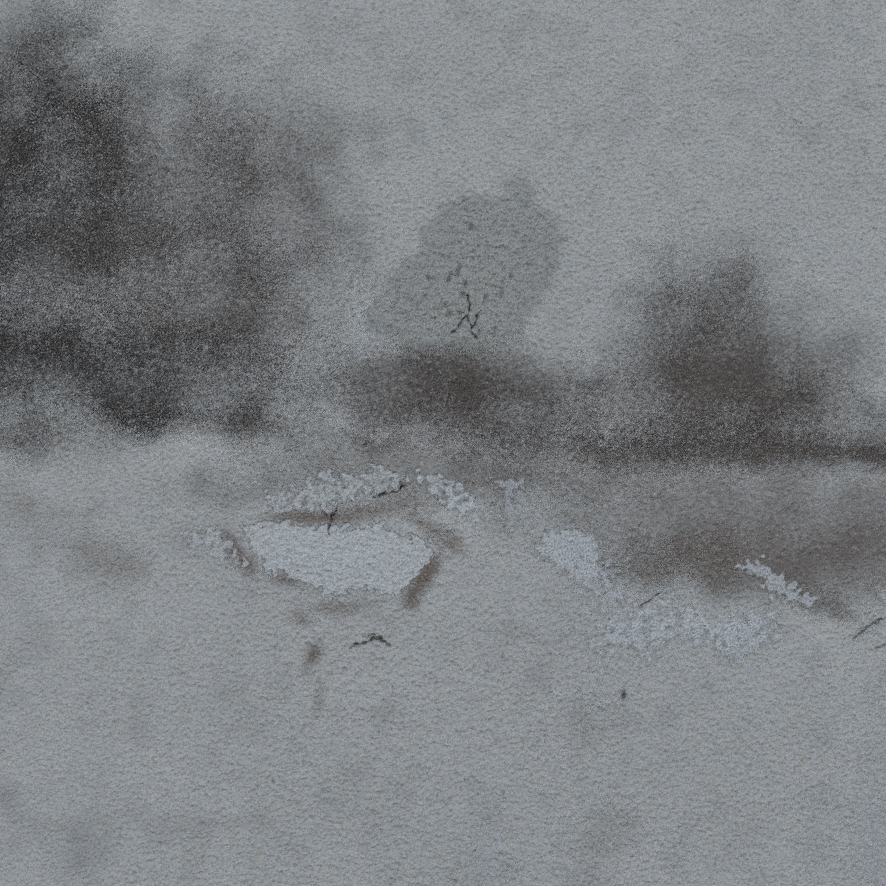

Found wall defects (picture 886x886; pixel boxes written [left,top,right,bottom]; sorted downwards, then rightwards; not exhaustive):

spalling [179,464,479,601]